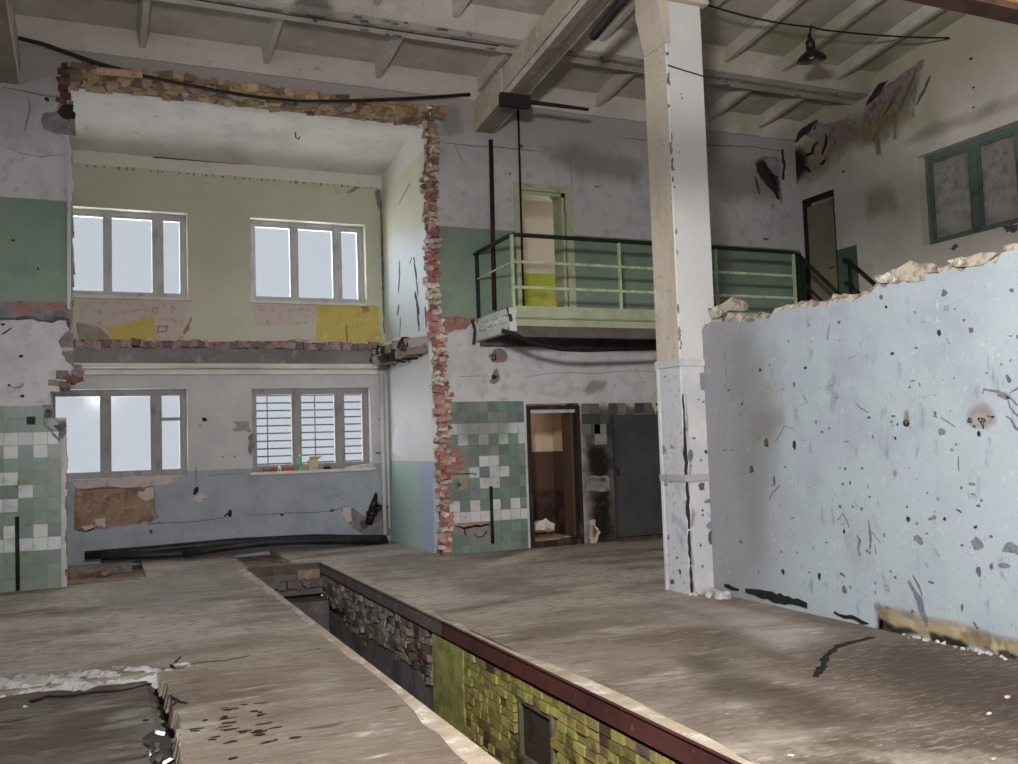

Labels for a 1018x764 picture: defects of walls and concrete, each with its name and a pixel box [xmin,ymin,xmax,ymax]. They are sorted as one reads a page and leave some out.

spalling [41,62,76,136]
spalling [794,59,931,180]
spalling [417,106,490,555]
rust [967,413,995,437]
crack [982,387,1018,431]
spalling [73,475,179,534]
damp [1002,542,1018,555]
damp [877,607,1018,659]
crack [29,655,250,764]